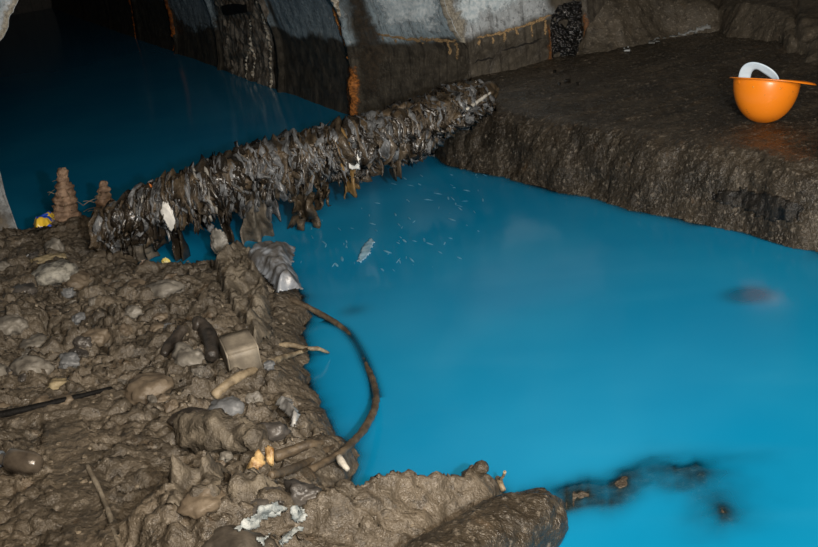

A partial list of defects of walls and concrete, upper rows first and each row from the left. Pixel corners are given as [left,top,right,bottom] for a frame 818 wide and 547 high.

water stain [245,20,256,80]
water stain [256,0,273,88]
water stain [350,0,440,91]
water stain [457,0,517,27]
water stain [547,0,589,59]
water stain [648,24,711,44]
rust [347,69,359,115]